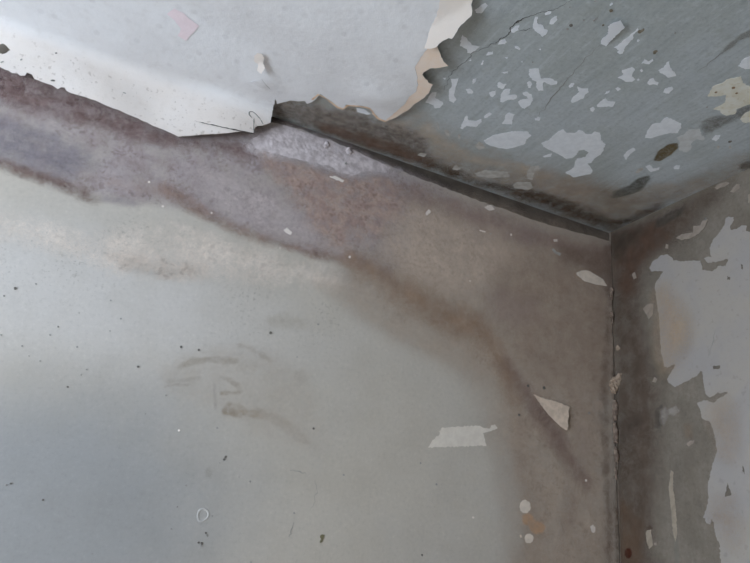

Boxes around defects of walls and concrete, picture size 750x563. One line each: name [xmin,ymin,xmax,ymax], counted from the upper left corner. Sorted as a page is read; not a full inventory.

peeling [460,35,479,61]
peeling [533,11,557,37]
peeling [601,20,640,54]
peeling [425,78,459,108]
peeling [489,68,557,109]
peeling [590,59,676,112]
peeling [708,56,750,123]
peeling [475,112,531,150]
peeling [541,129,606,177]
peeling [645,117,720,152]
peeling [643,217,750,563]
crack [609,279,622,563]